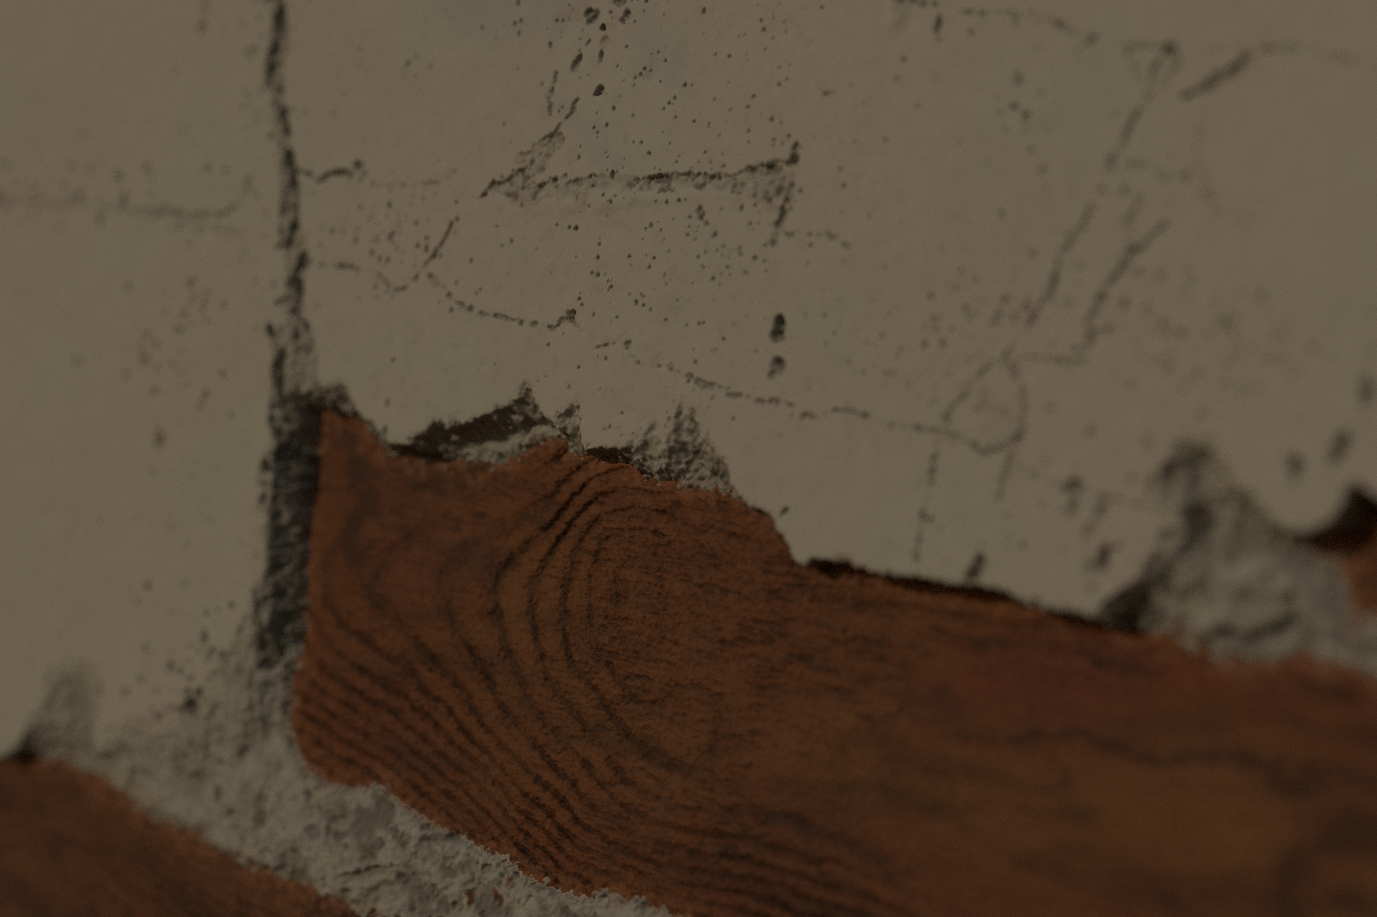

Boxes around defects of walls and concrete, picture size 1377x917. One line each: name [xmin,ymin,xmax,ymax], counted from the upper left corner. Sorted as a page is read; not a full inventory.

flaking render [232,472,313,746]
flaking render [285,353,775,522]
crack [248,0,1255,674]
flaking render [1112,435,1309,646]
flaking render [11,659,114,777]